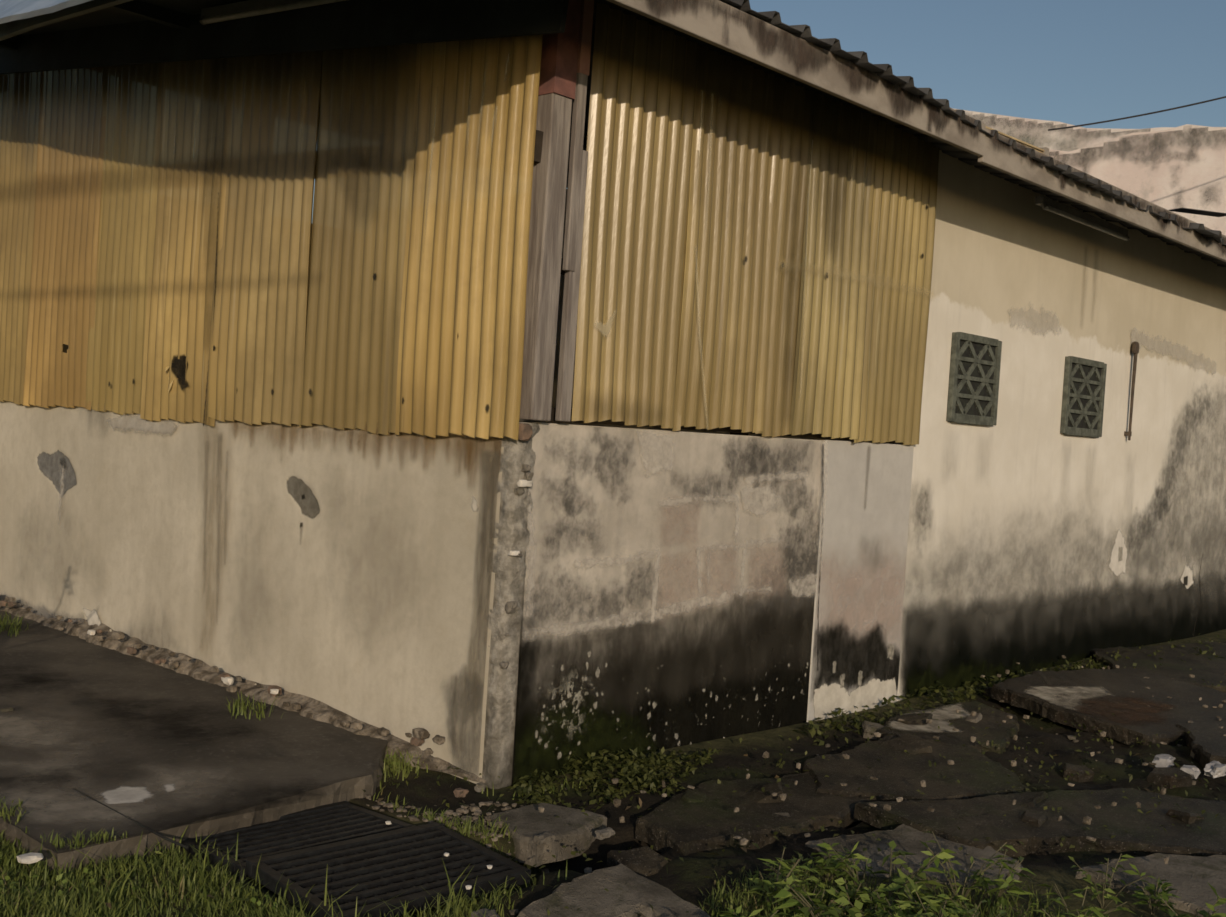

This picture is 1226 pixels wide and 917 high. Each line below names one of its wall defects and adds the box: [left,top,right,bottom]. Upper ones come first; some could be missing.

leakage [648,0,1226,188]
leakage [1126,192,1226,253]
spalling [482,422,607,789]
leakage [511,446,1226,786]
peeling [1109,530,1127,576]
peeling [1181,565,1193,589]